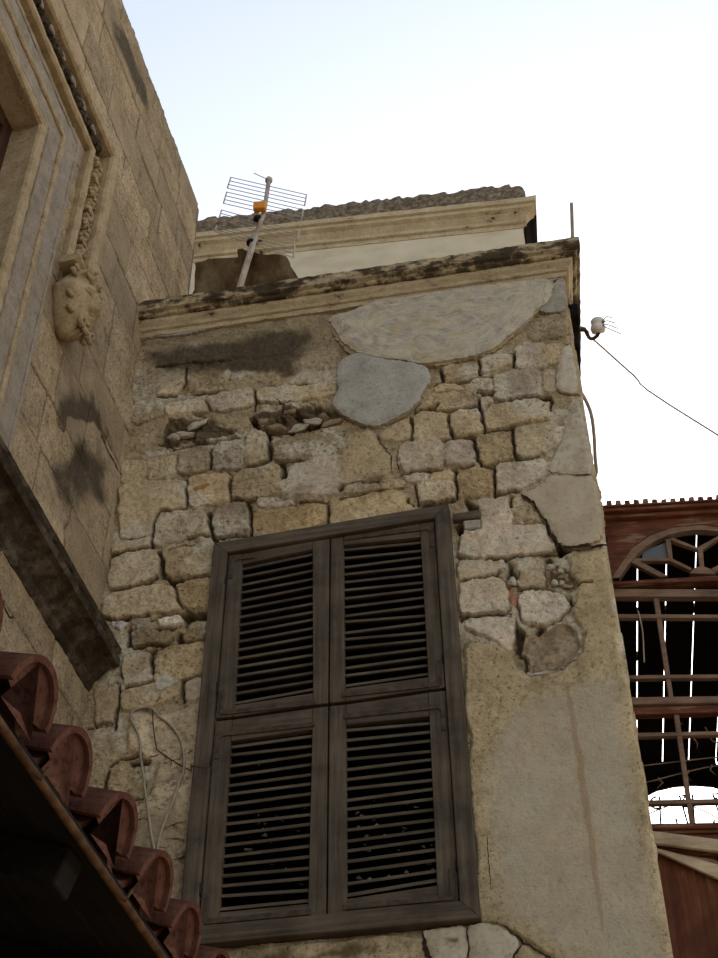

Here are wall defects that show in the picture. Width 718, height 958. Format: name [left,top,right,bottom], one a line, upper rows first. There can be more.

spalling [164,418,232,449]
spalling [254,405,343,441]
peeling [521,344,606,553]
crack [520,493,608,558]
spalling [546,564,577,591]
peeling [421,923,545,958]